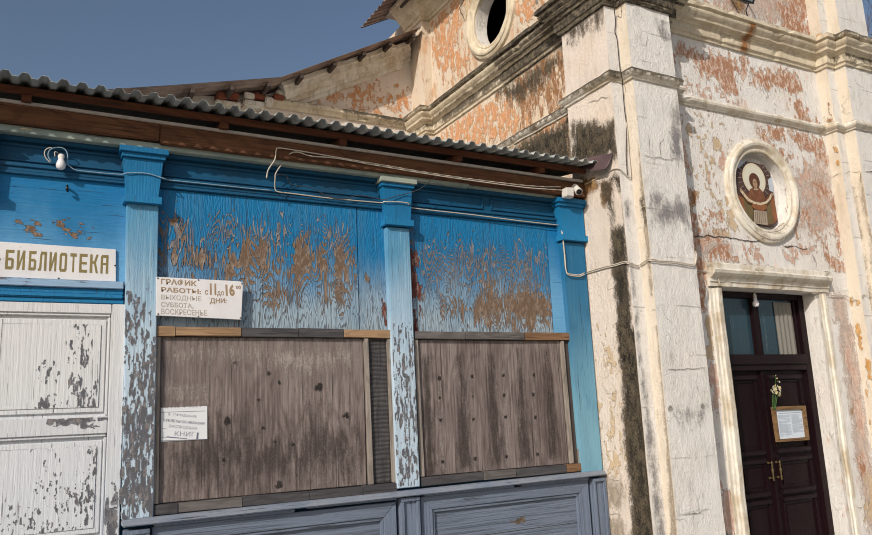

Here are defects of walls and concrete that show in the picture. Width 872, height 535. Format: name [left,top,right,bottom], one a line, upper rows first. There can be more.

peeling [422,0,472,87]
peeling [441,48,569,149]
leakage [495,56,561,101]
peeling [512,0,545,33]
leakage [509,117,617,160]
peeling [158,200,370,319]
crack [694,234,759,242]
peeling [673,40,846,414]
peeling [0,291,157,535]
peeling [381,227,553,487]
leakage [581,173,677,535]
peeling [842,323,872,439]